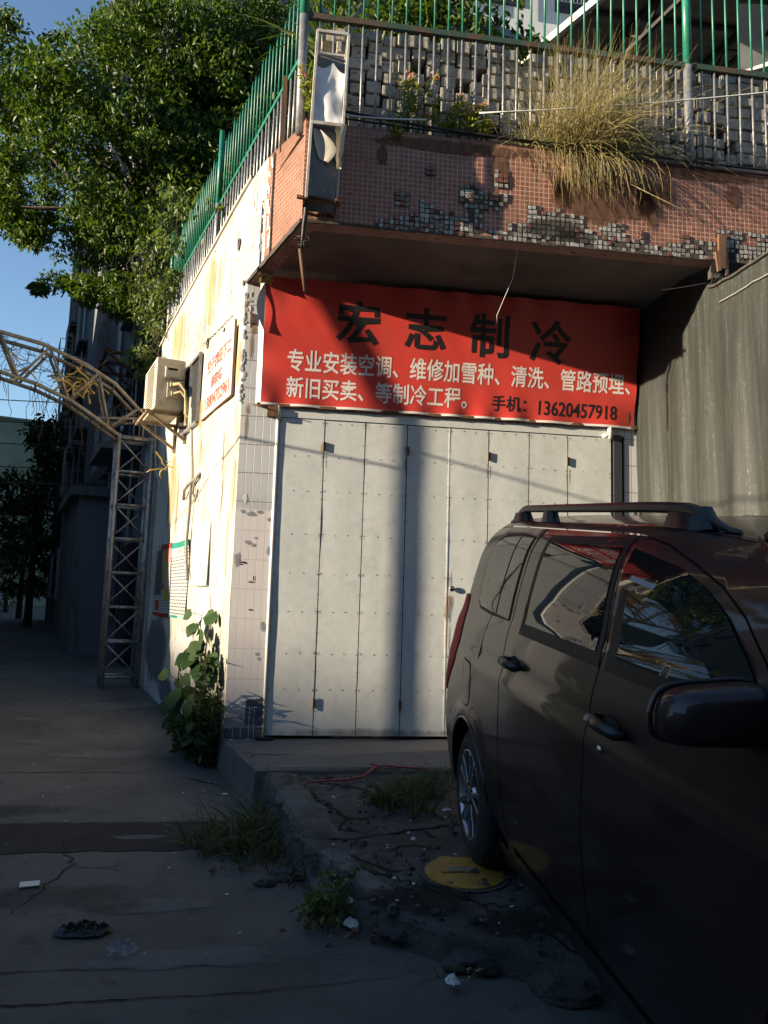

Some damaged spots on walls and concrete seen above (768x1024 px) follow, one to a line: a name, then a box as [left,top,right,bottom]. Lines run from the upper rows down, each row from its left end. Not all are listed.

spalling [374,169,768,285]
peeling [240,494,272,521]
peeling [234,537,270,566]